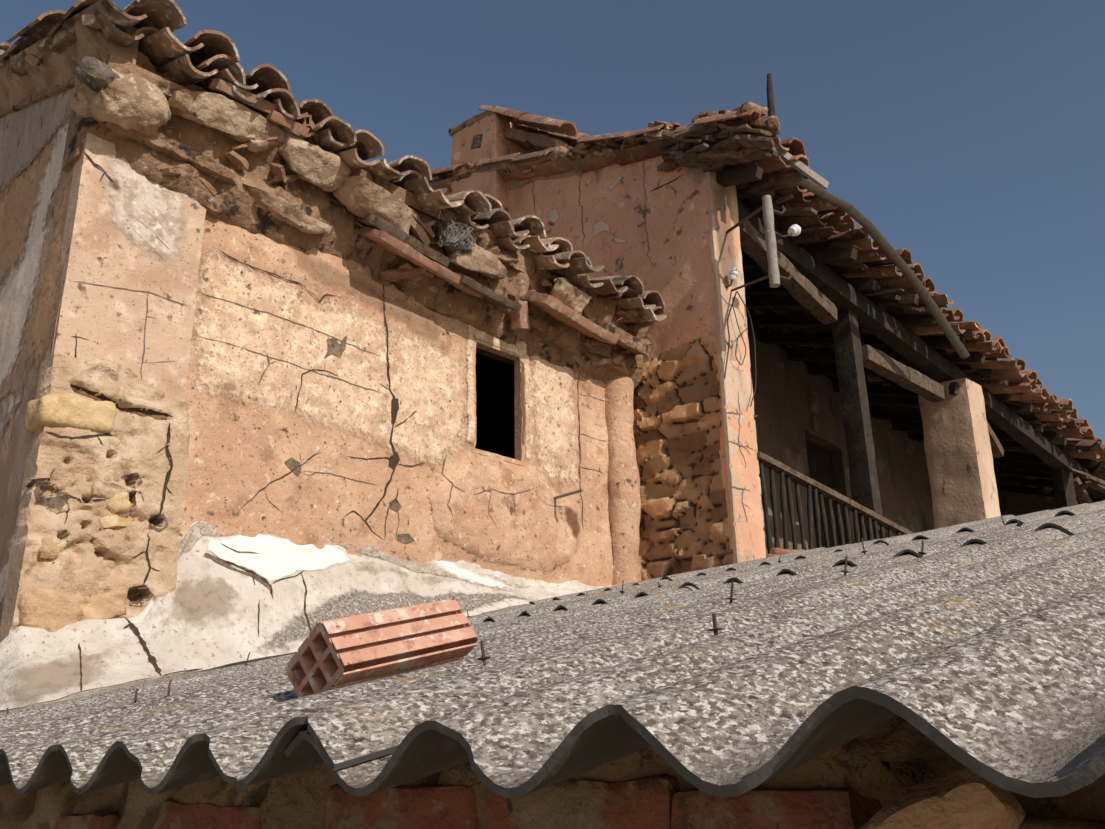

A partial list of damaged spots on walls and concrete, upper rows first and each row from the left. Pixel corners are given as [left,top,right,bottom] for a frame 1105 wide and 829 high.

flaking render [0,88,74,385]
crack [213,246,342,302]
crack [75,281,607,540]
spalling [26,480,70,509]
crack [29,469,106,525]
crack [47,384,174,584]
spalling [106,491,133,514]
spalling [0,533,129,632]
crack [216,543,312,635]
crack [18,618,199,707]